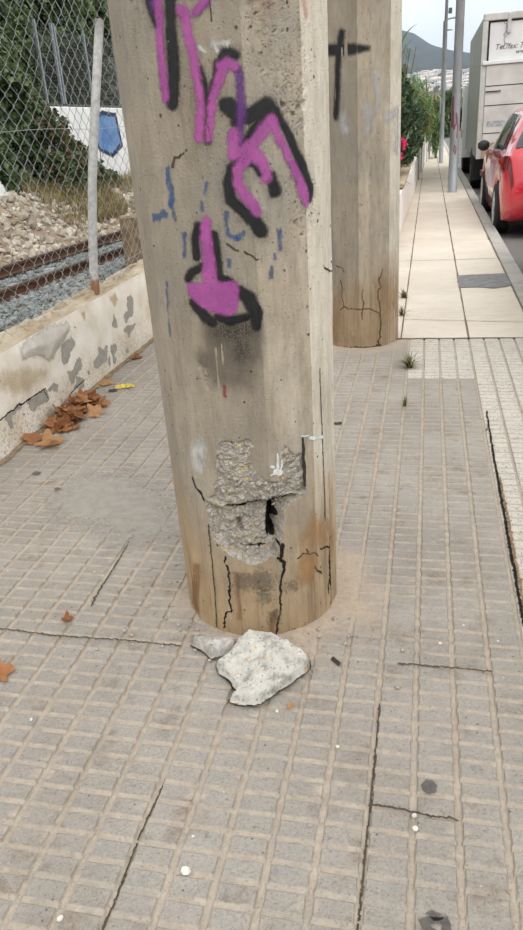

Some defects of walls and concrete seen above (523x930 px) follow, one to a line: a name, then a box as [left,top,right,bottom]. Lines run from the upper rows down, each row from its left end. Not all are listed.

peeling [61,326,129,389]
peeling [112,295,136,337]
crack [324,265,383,348]
peeling [4,383,58,428]
crack [0,379,85,421]
crack [319,373,327,521]
spalling [203,437,307,565]
crack [208,524,233,628]
crack [276,546,331,634]